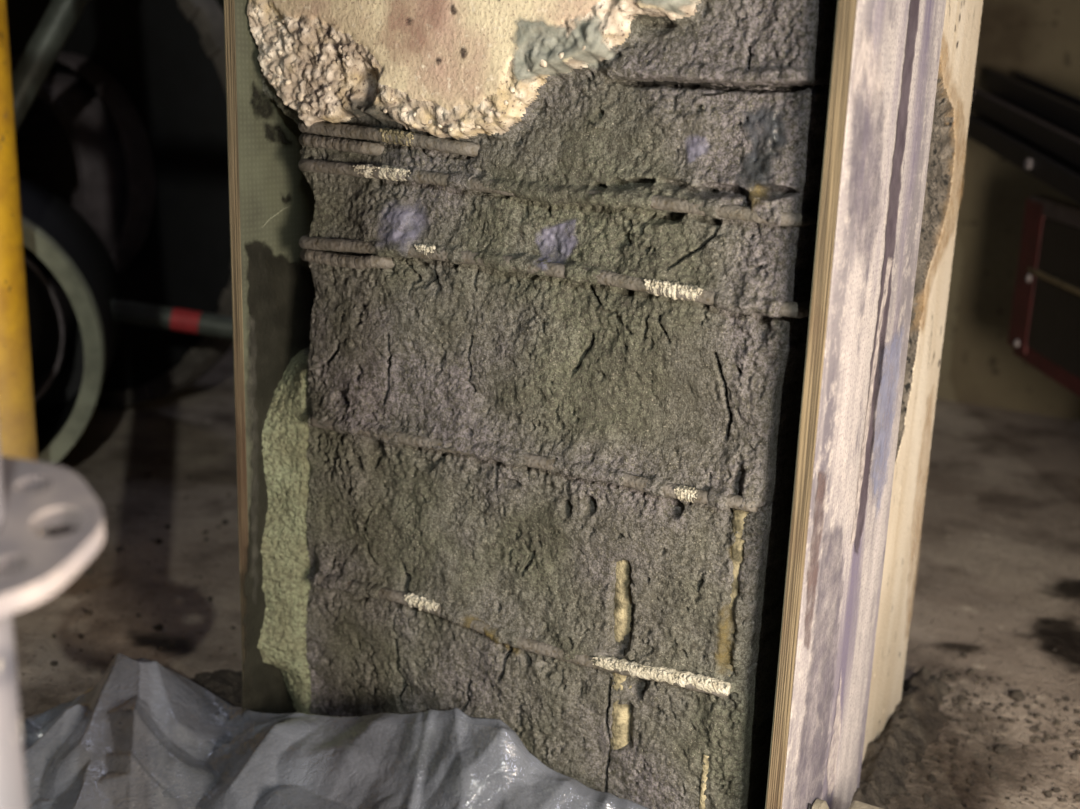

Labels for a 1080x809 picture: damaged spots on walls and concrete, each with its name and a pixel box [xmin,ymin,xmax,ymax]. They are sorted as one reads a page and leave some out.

damp [353,164,411,181]
spalling [895,60,955,461]
damp [644,279,703,301]
spalling [247,0,838,809]
crack [717,357,732,428]
damp [404,592,440,612]
damp [591,655,731,696]